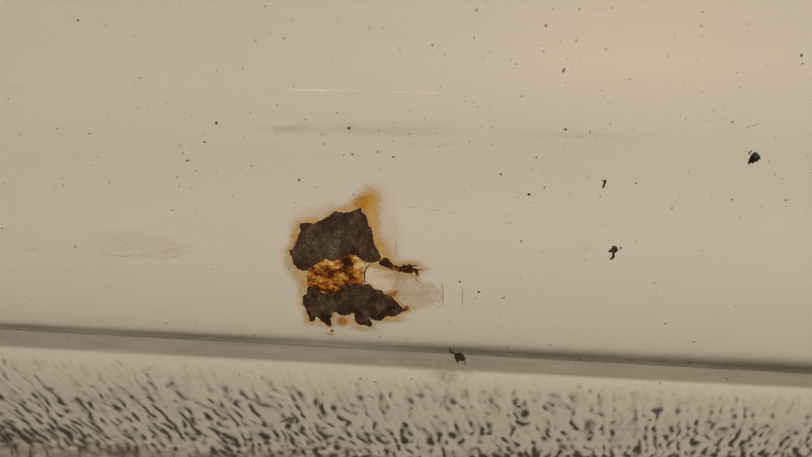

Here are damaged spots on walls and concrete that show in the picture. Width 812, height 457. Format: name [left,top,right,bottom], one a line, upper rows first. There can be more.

corrosion [287,192,444,335]